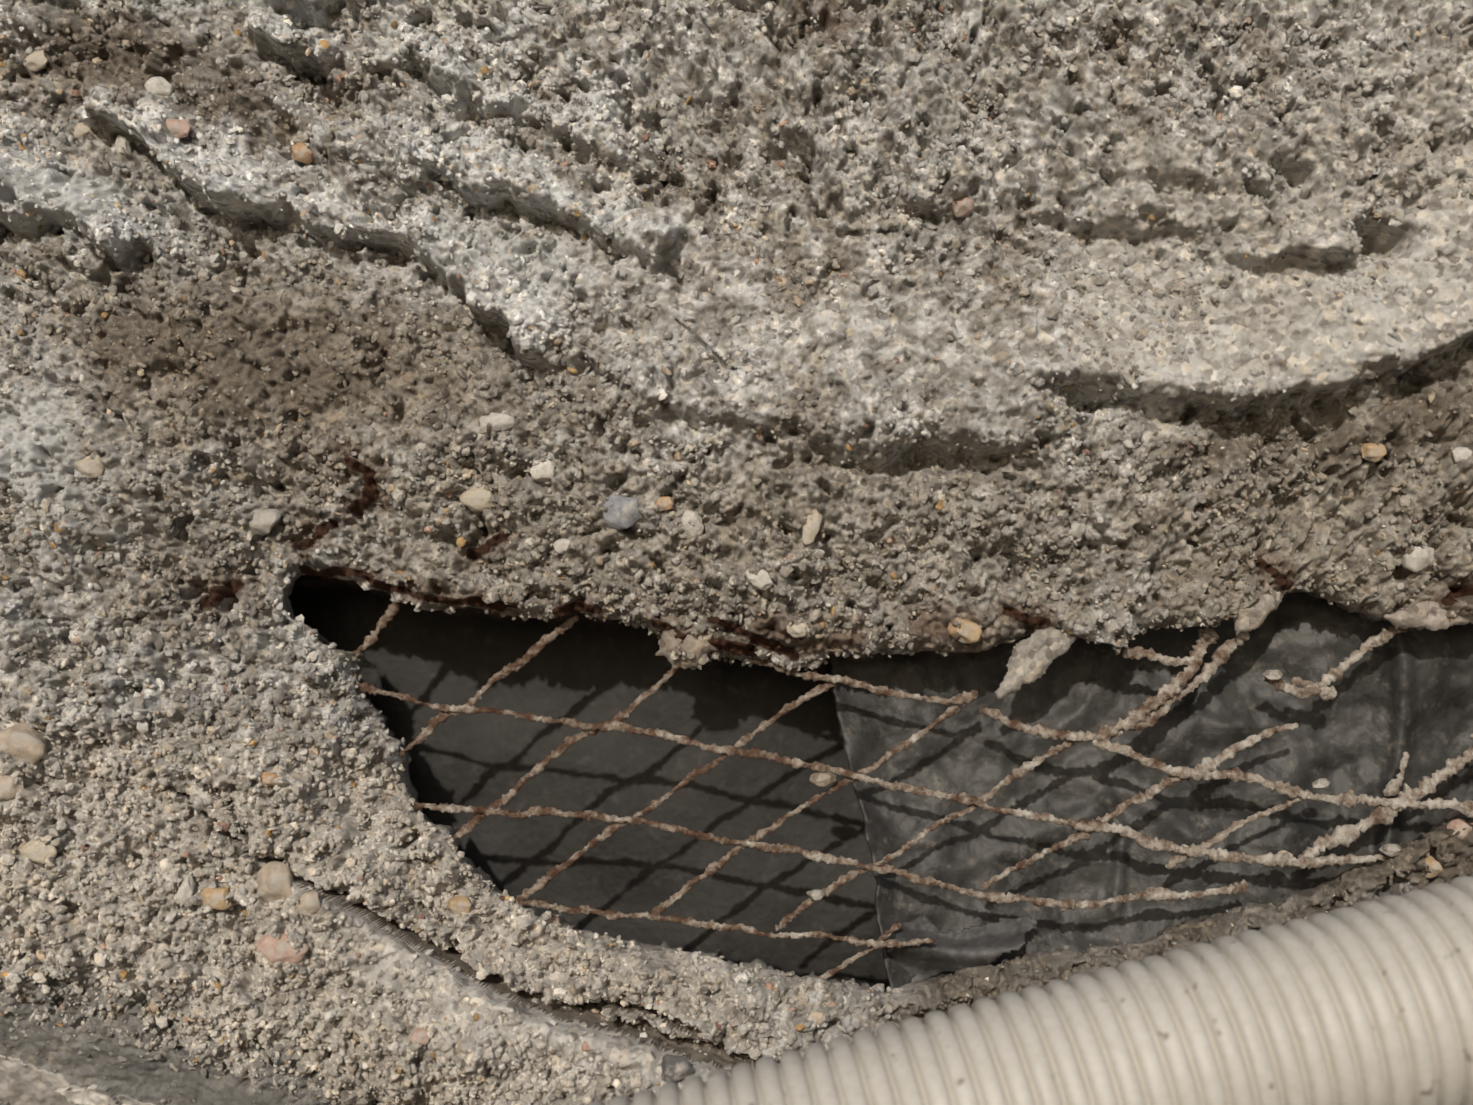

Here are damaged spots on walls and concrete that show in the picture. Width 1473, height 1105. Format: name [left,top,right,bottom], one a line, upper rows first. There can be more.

corrosion [291,455,515,612]
corrosion [552,599,602,617]
corrosion [652,616,799,661]
corrosion [1004,607,1051,626]
spalling [782,336,1473,700]
corrosion [1441,584,1473,605]
spalling [274,569,1465,998]
crack [155,775,780,1070]